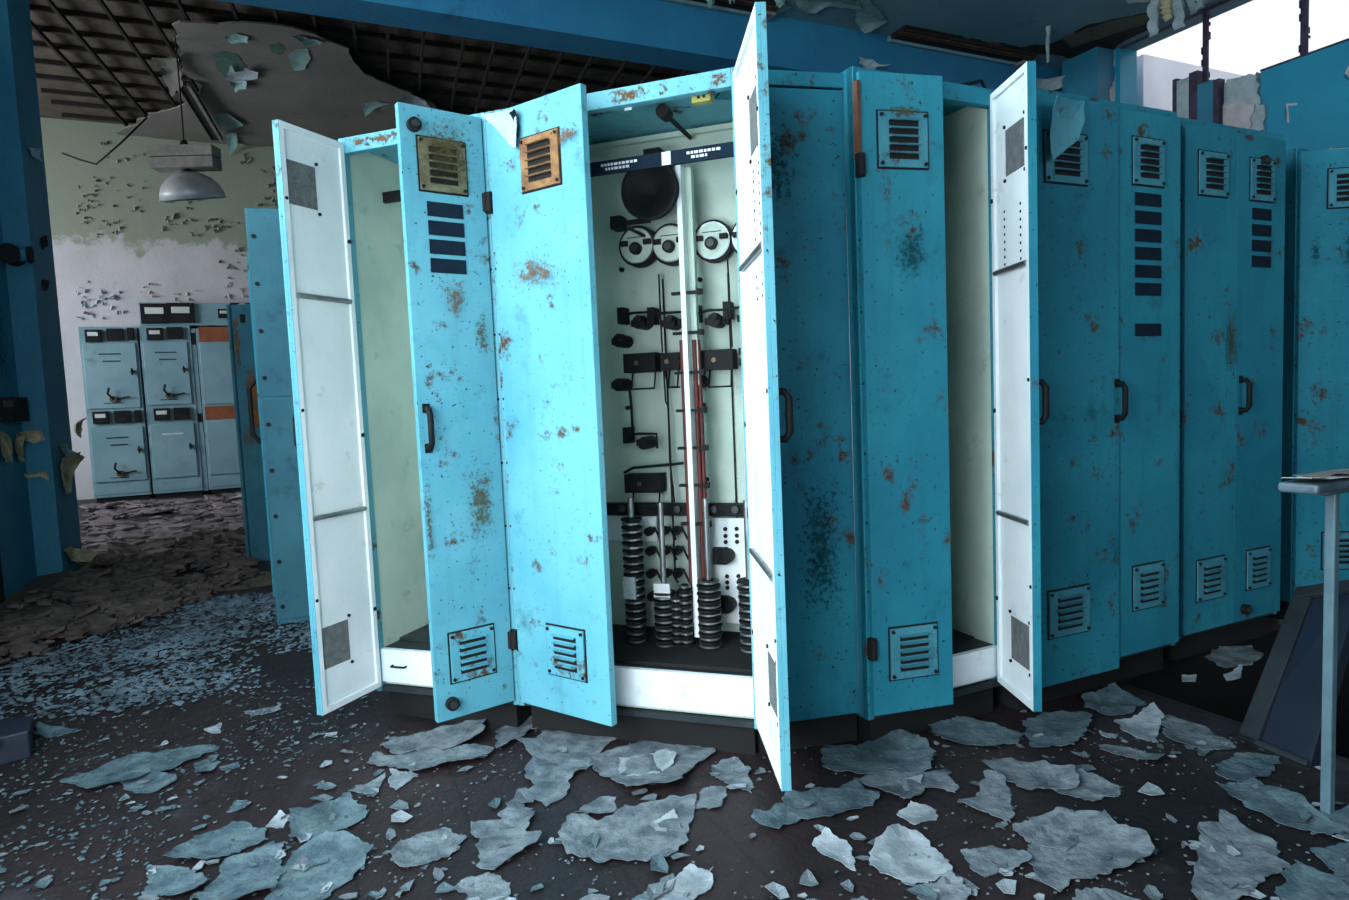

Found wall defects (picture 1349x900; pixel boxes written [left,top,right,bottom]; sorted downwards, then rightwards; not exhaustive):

peeling [772,0,888,34]
peeling [151,57,183,97]
peeling [211,33,258,92]
peeling [269,36,323,71]
peeling [361,94,431,117]
peeling [213,113,278,207]
peeling [76,177,144,238]
peeling [76,281,123,321]
peeling [0,418,86,495]